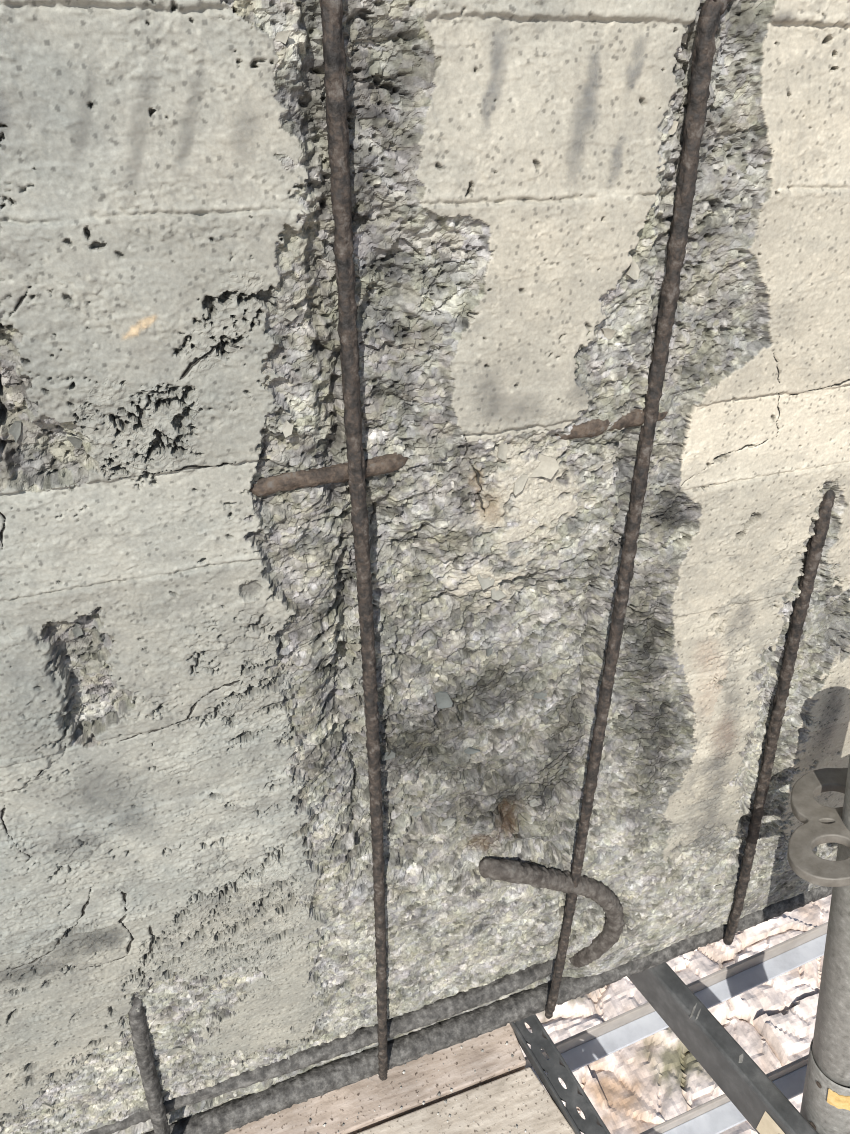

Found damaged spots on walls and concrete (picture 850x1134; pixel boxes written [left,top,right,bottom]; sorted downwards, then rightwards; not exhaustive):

crack [8,891,91,970]
crack [80,890,153,982]
spalling [0,0,388,1134]
spalling [342,0,728,1071]
spalling [479,0,850,1005]
crack [674,353,850,488]